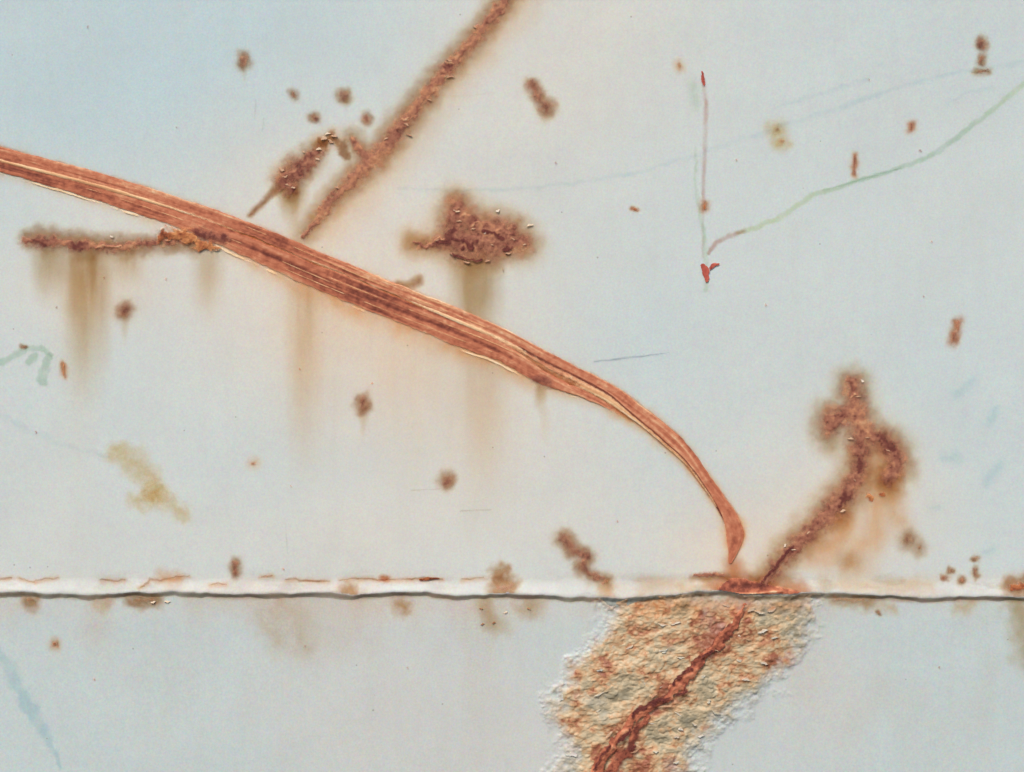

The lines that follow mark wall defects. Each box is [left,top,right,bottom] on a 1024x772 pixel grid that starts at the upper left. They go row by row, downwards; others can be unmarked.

rust [278,0,508,238]
rust [22,227,221,252]
rust [413,200,533,272]
rust [694,377,906,594]